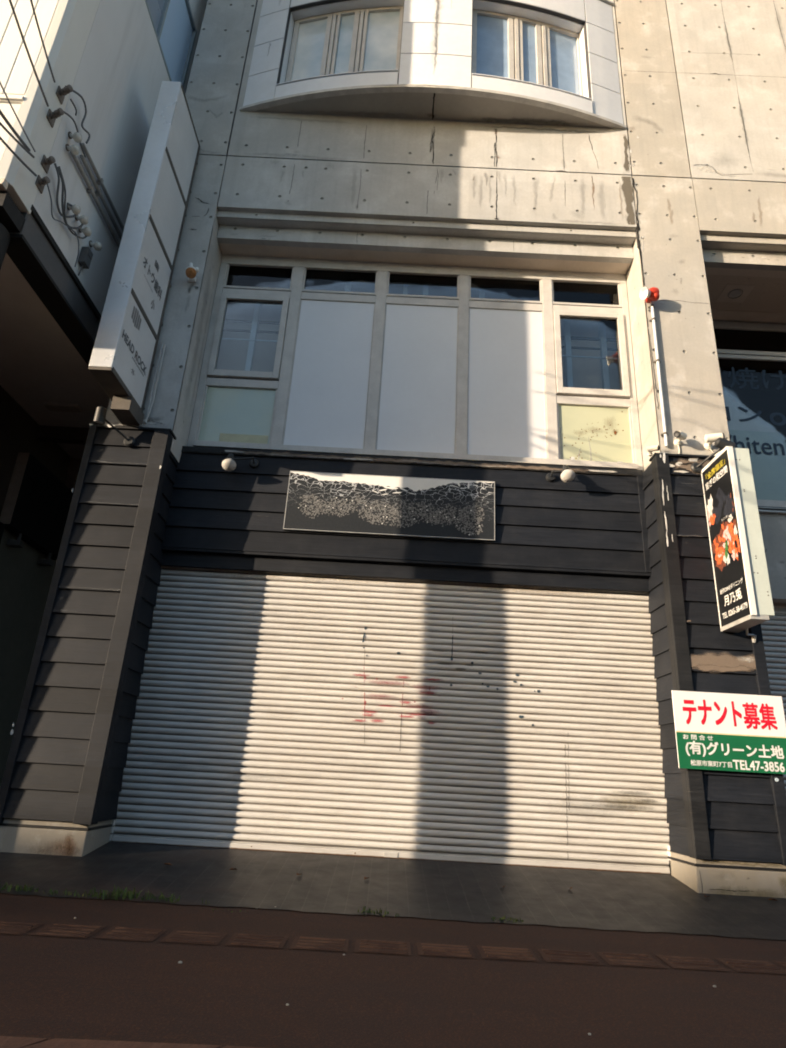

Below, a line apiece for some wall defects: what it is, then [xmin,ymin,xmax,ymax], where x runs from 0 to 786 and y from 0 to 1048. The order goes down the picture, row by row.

crack [642,3,786,169]
crack [427,127,439,210]
leakage [622,136,635,225]